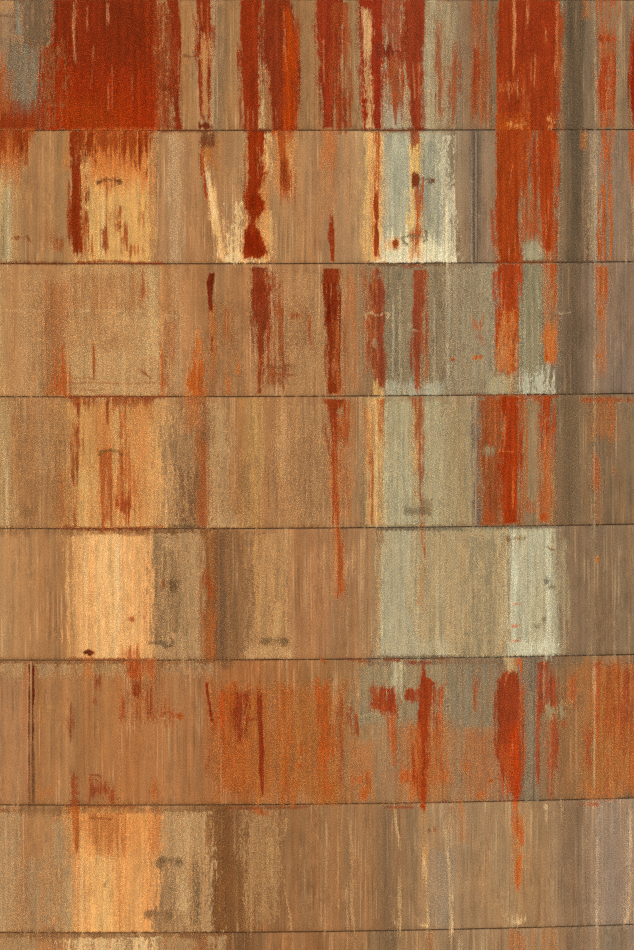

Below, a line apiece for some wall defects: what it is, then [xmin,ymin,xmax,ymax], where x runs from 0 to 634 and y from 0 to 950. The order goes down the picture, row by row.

rust [0,0,182,257]
rust [196,0,213,130]
rust [240,0,311,393]
rust [315,0,425,434]
rust [435,0,564,375]
rust [596,0,621,321]
rust [100,397,154,528]
rust [322,216,350,598]
rust [479,396,553,523]
rust [205,679,371,806]
rust [370,665,449,813]
rust [489,657,577,890]